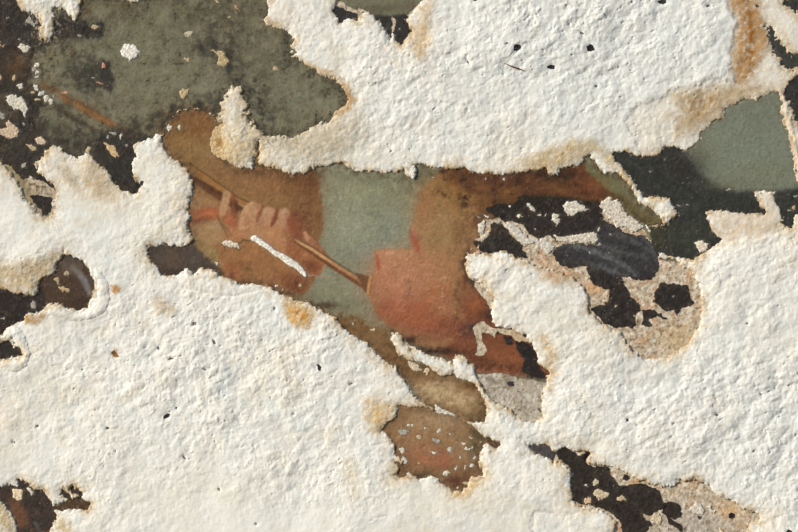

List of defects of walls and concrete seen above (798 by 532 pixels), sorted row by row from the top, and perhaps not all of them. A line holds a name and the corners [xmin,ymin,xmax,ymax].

peeling [333,0,422,45]
peeling [764,26,798,72]
peeling [783,0,798,14]
peeling [0,0,349,218]
peeling [784,75,798,121]
peeling [0,255,95,359]
peeling [148,90,798,492]
peeling [0,479,91,532]
peeling [529,444,760,532]